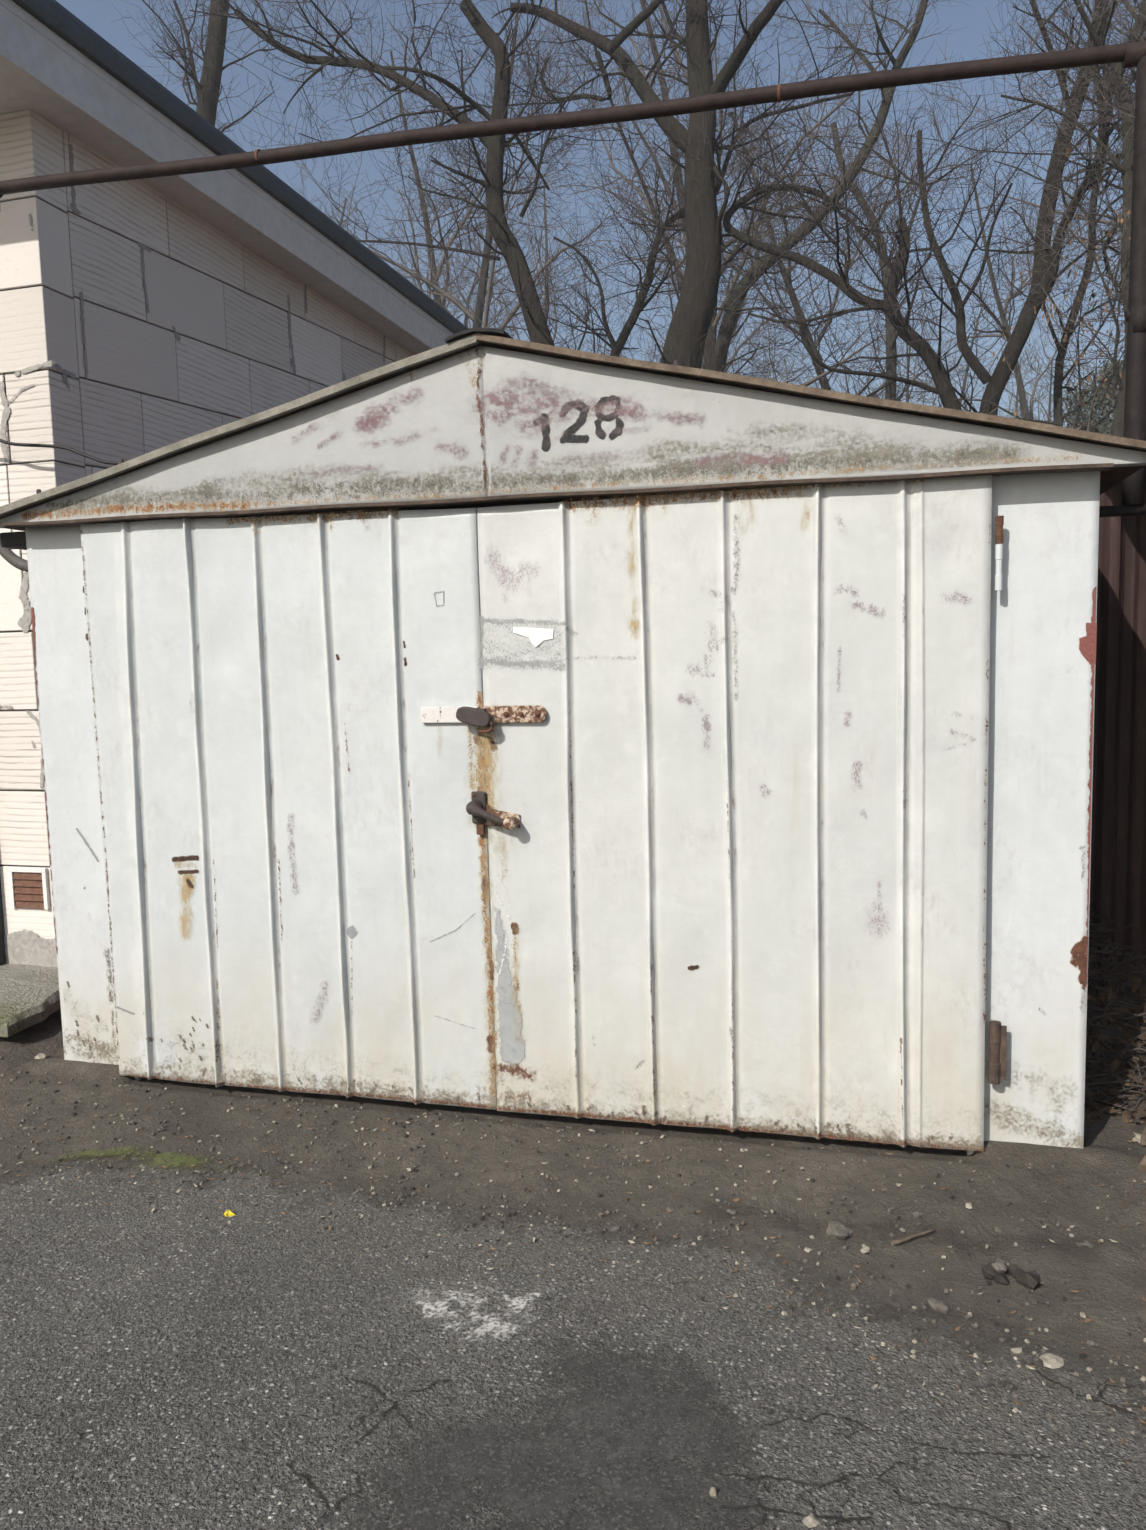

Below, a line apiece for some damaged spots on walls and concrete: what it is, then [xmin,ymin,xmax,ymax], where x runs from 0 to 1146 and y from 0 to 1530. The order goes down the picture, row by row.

rust [22,495,398,663]
peeling [494,874,525,1064]
rust [92,681,984,1151]
rust [1070,936,1088,1003]